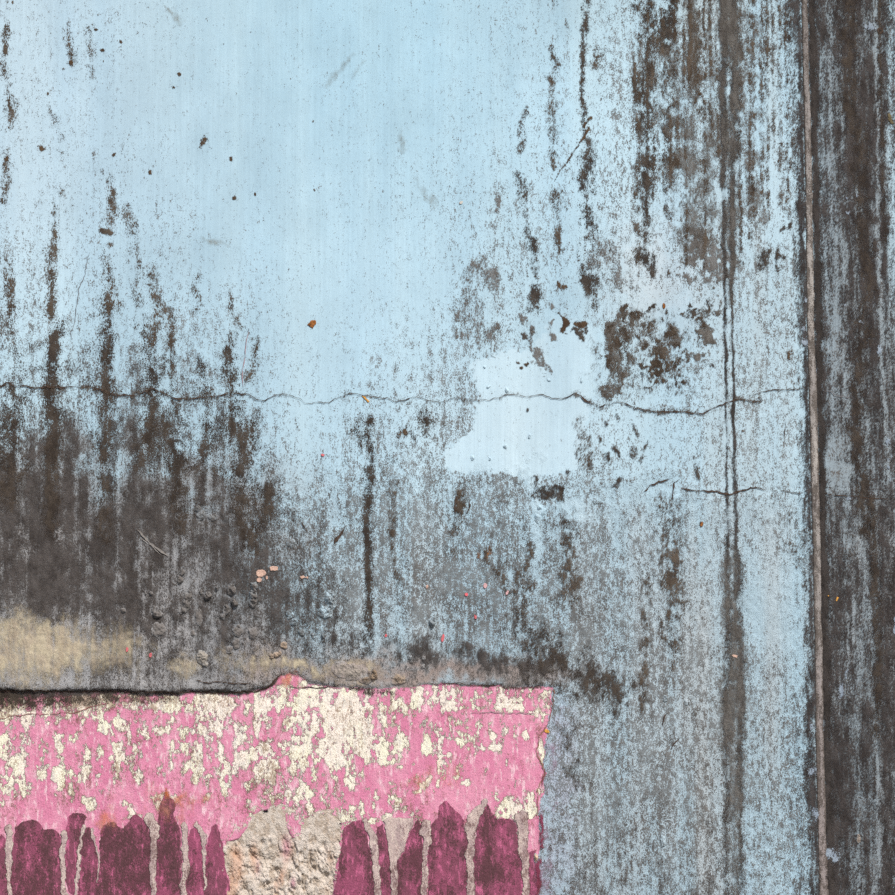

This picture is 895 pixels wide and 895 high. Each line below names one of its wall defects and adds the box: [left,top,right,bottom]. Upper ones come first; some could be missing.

leakage [0,21,19,129]
leakage [62,15,105,80]
leakage [0,146,12,204]
crack [0,332,804,417]
leakage [0,168,403,692]
leakage [394,397,445,447]
leakage [449,489,466,557]
leakage [512,0,895,895]
crack [644,479,801,496]
crack [825,492,894,500]
leakage [483,541,537,625]
peeling [0,674,553,895]